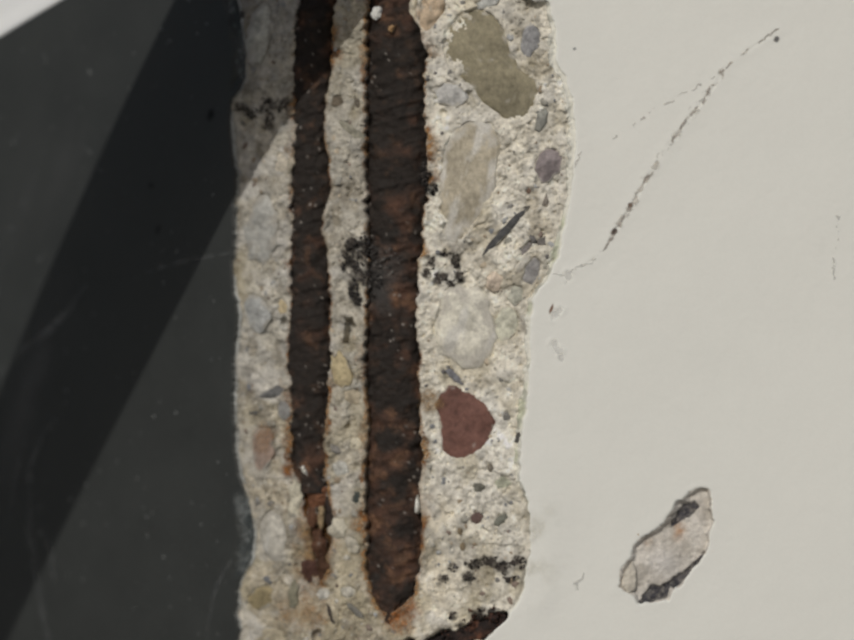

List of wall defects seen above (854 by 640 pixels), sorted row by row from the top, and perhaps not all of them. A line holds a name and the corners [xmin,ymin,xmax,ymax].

corrosion [361,0,371,116]
crack [672,29,778,142]
corrosion [340,225,401,329]
spalling [231,0,576,640]
crack [554,162,658,276]
corrosion [359,365,371,482]
corrosion [301,452,339,588]
corrosion [355,507,419,631]
corrosion [439,606,507,640]
spalling [618,488,714,604]